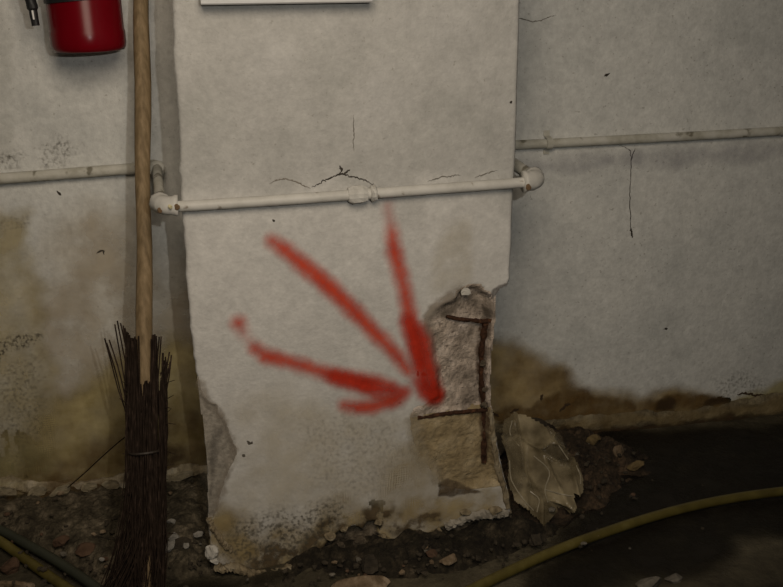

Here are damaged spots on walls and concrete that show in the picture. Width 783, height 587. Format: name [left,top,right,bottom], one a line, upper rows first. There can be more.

crack [429,170,497,181]
crack [619,145,635,238]
damp [0,218,130,490]
damp [153,292,207,470]
spalling [410,284,518,532]
damp [490,342,727,435]
flaking render [545,392,783,431]
flaking render [167,376,292,578]
damp [213,499,492,570]
flaking render [324,519,391,548]